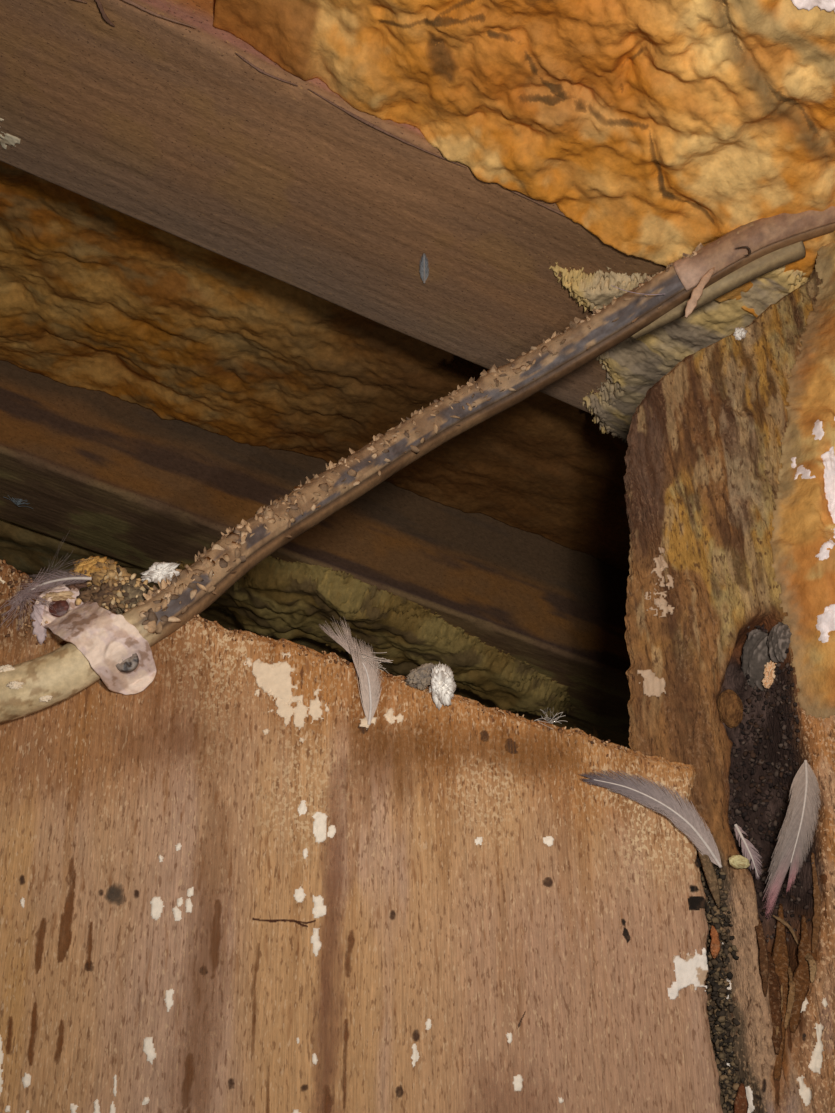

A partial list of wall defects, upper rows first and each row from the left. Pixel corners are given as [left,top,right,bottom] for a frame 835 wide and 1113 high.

peeling [0,118,21,149]
peeling [791,416,835,560]
peeling [644,547,675,618]
peeling [816,604,835,643]
peeling [243,652,330,743]
peeling [637,669,666,697]
peeling [359,708,406,728]
damp [505,738,518,754]
crack [253,918,315,927]
peeling [667,946,708,1000]
peeling [0,1035,11,1112]
peeling [93,1074,117,1113]